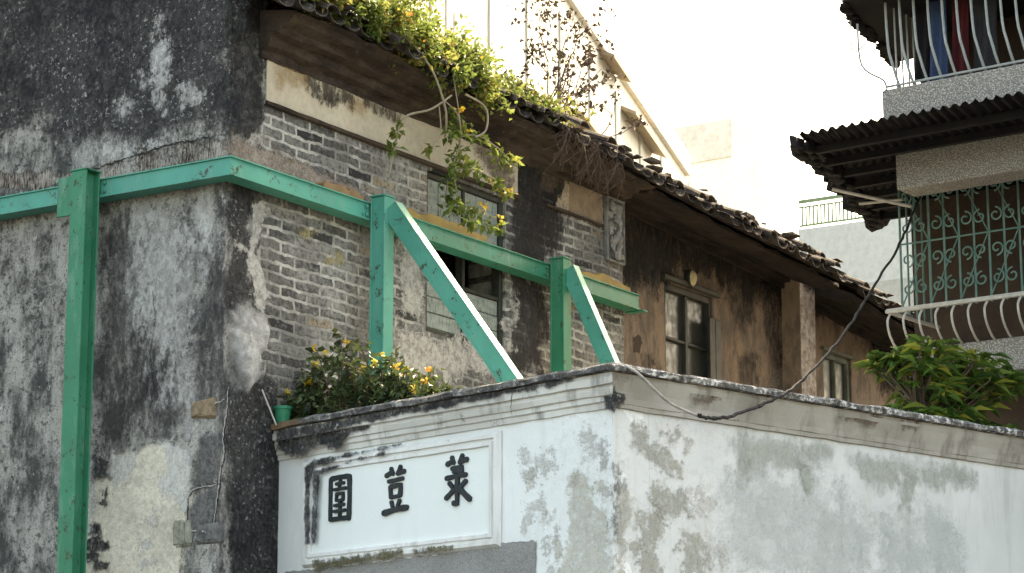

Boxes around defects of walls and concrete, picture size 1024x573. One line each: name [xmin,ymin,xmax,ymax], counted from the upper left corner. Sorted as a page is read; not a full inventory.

damp [0,0,267,174]
crack [93,133,229,169]
damp [91,181,572,573]
damp [730,285,783,386]
spalling [285,419,732,573]